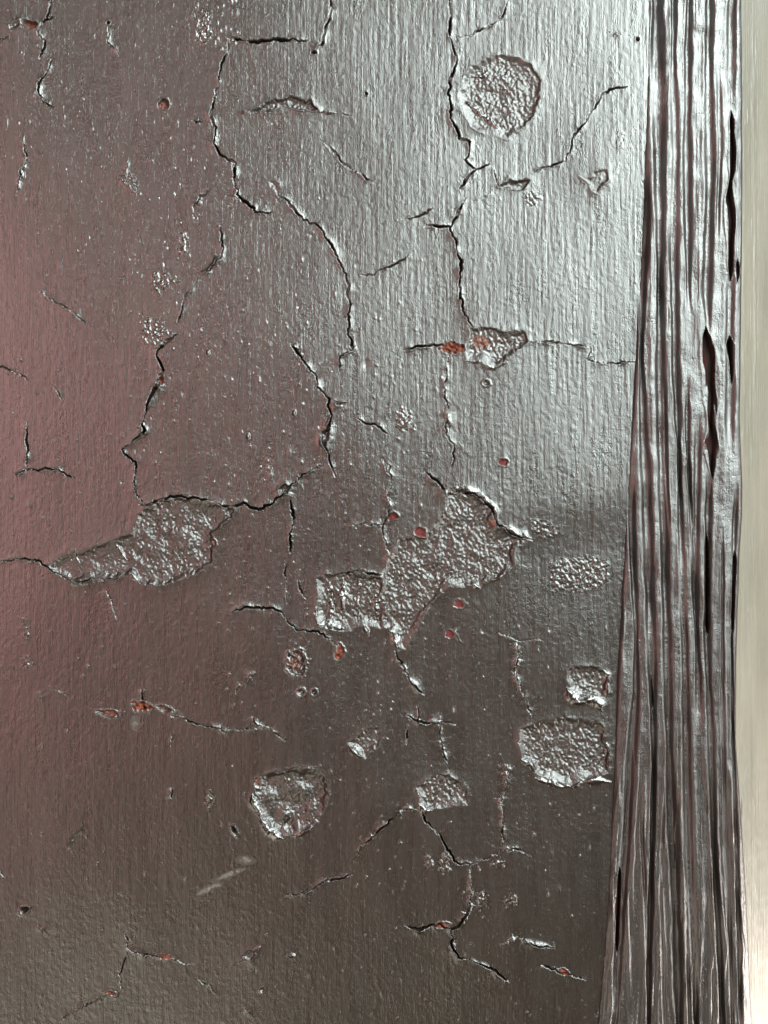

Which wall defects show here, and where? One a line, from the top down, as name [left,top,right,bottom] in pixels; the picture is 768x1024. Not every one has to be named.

crack [532,84,633,175]
crack [119,0,511,646]
rust [436,331,498,358]
peeling [462,324,531,388]
crack [529,338,635,366]
crack [402,342,535,542]
peeling [311,571,383,636]
rust [452,599,467,610]
peeling [516,664,613,789]
peeling [249,764,332,840]
peeling [415,772,472,814]
crack [281,761,589,984]